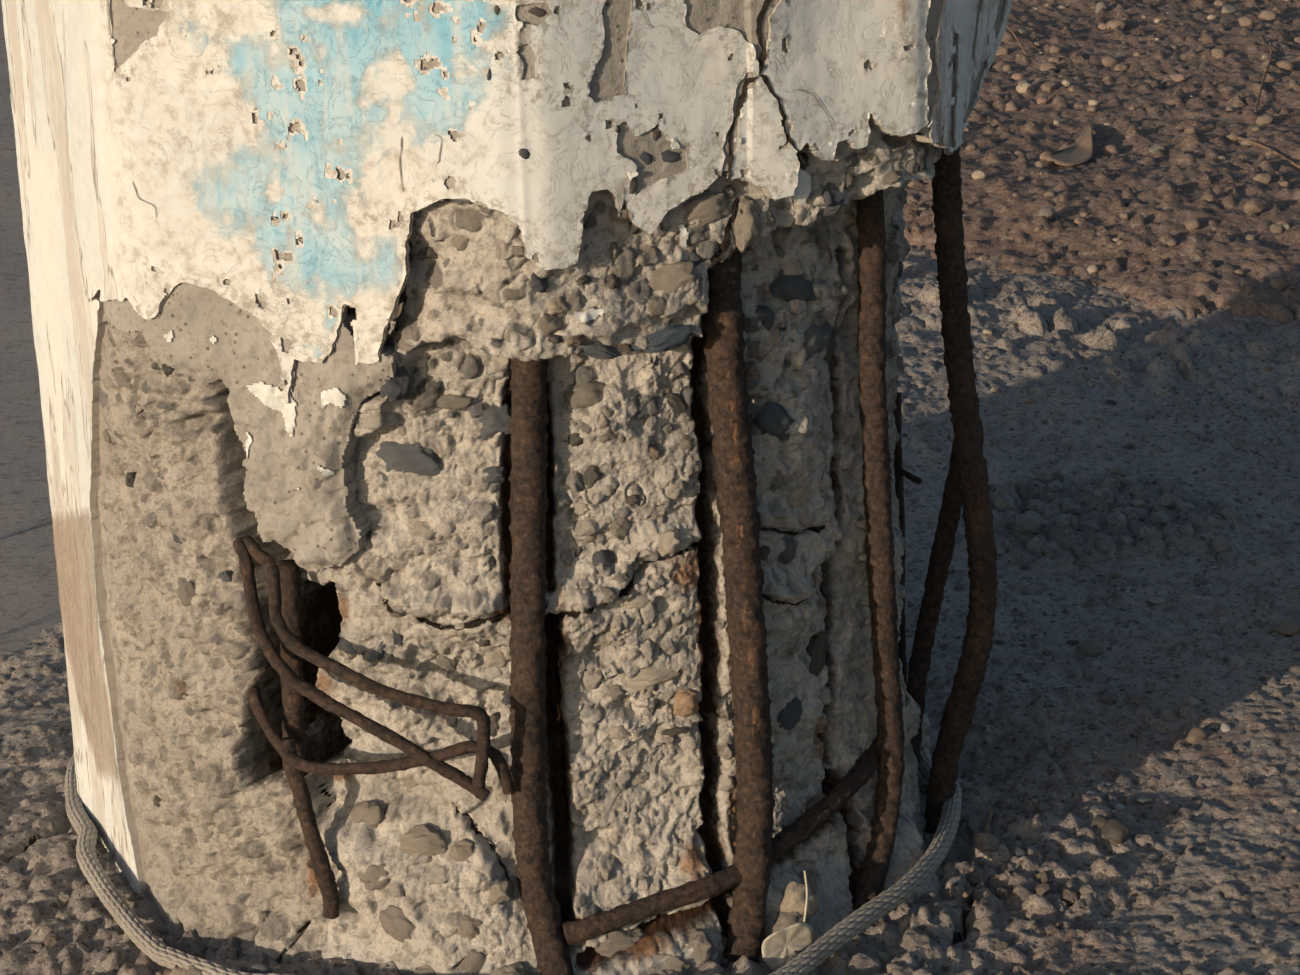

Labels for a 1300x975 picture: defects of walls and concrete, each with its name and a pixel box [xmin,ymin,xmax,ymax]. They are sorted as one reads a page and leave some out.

peeling [994,0,1005,34]
crack [710,0,834,269]
corrosion [503,373,512,408]
corrosion [301,579,349,762]
corrosion [500,434,512,613]
spalling [98,0,998,975]
corrosion [545,384,556,593]
corrosion [689,333,726,874]
corrosion [544,613,576,922]
corrosion [576,889,733,973]
corrosion [776,804,863,903]
corrosion [816,733,841,795]